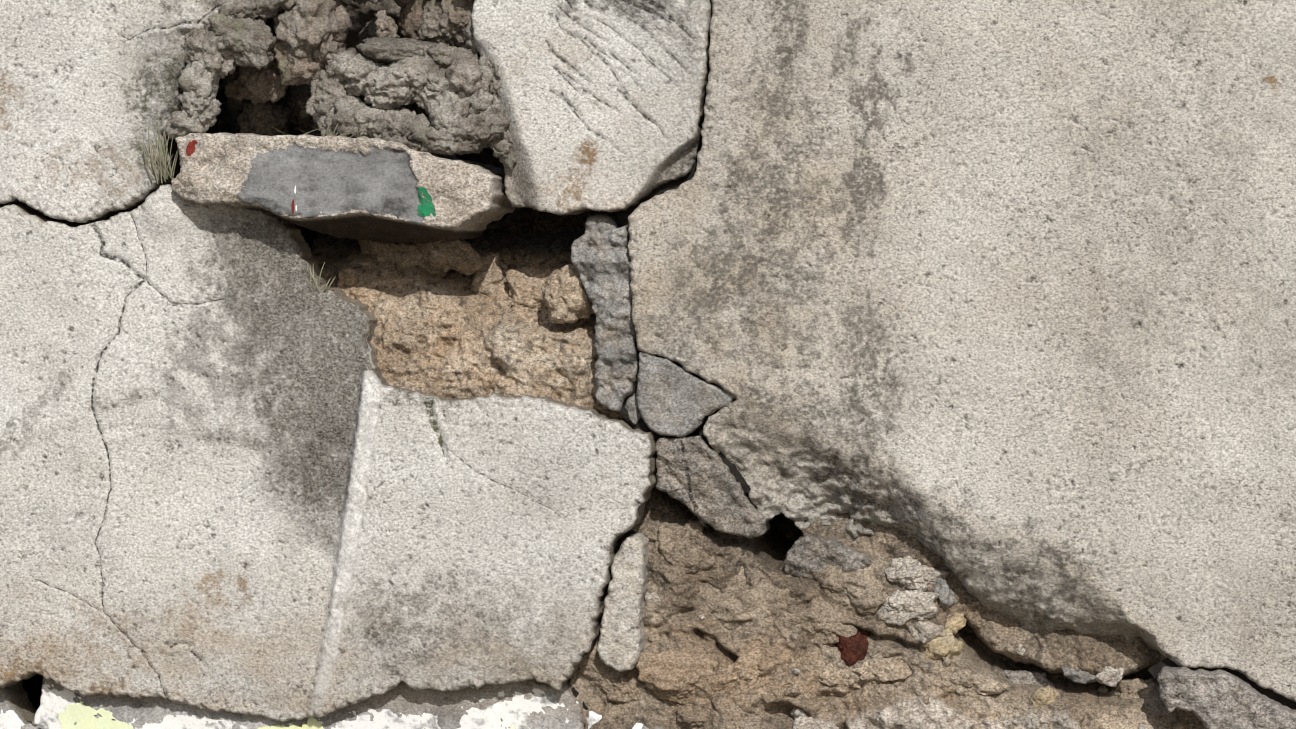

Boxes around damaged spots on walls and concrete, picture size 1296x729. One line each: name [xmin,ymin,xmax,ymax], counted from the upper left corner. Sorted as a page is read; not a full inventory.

spalling [162,0,517,171]
crack [616,94,707,228]
damp [678,0,912,368]
crack [0,179,231,697]
spalling [311,207,627,457]
crack [620,341,751,527]
damp [774,447,882,503]
damp [841,293,901,431]
peeling [0,682,441,729]
spalling [457,470,1207,729]
damp [1000,520,1097,622]
crack [1148,658,1296,709]